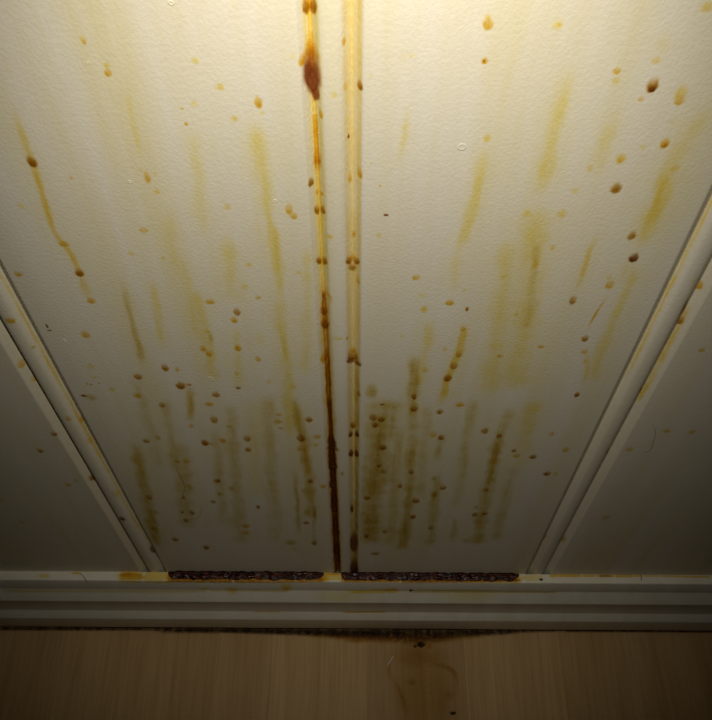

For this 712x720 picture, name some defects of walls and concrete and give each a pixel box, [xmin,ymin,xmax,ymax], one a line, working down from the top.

rust [168,570,324,581]
rust [341,571,519,582]